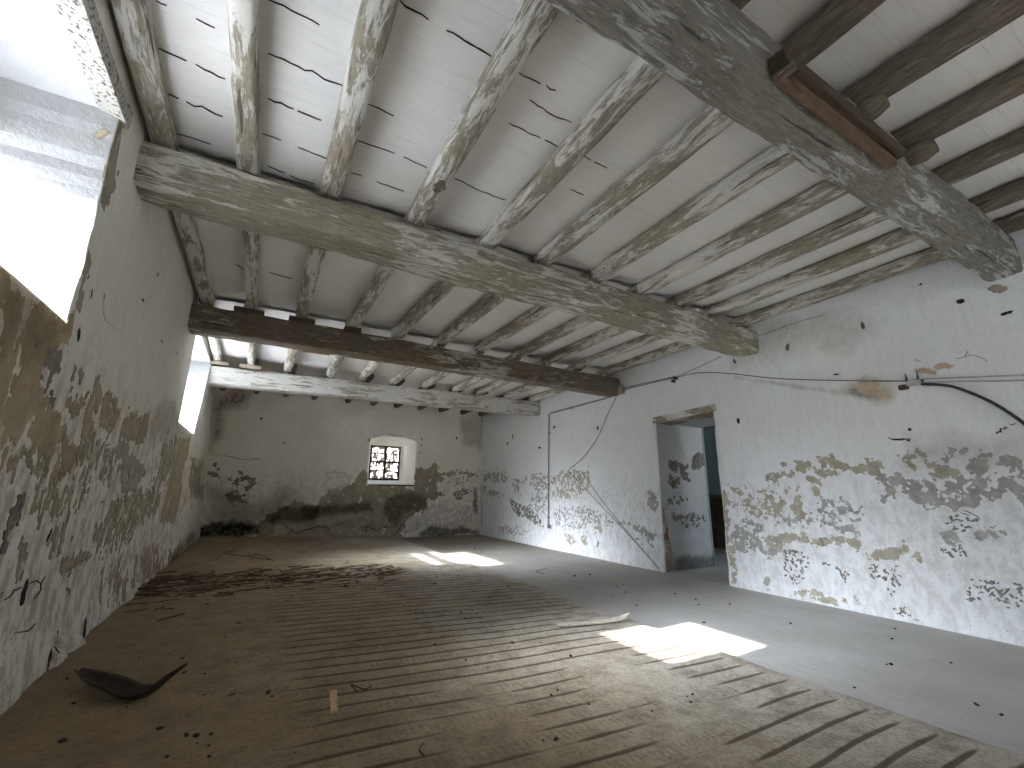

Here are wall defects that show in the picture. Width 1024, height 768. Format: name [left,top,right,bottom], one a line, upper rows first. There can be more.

spalling [99,119,122,212]
spalling [984,283,1012,296]
peeling [0,249,257,612]
damp [188,523,259,542]
damp [269,503,371,523]
damp [420,526,477,537]
flaking render [256,438,706,572]
peeling [722,427,1024,621]